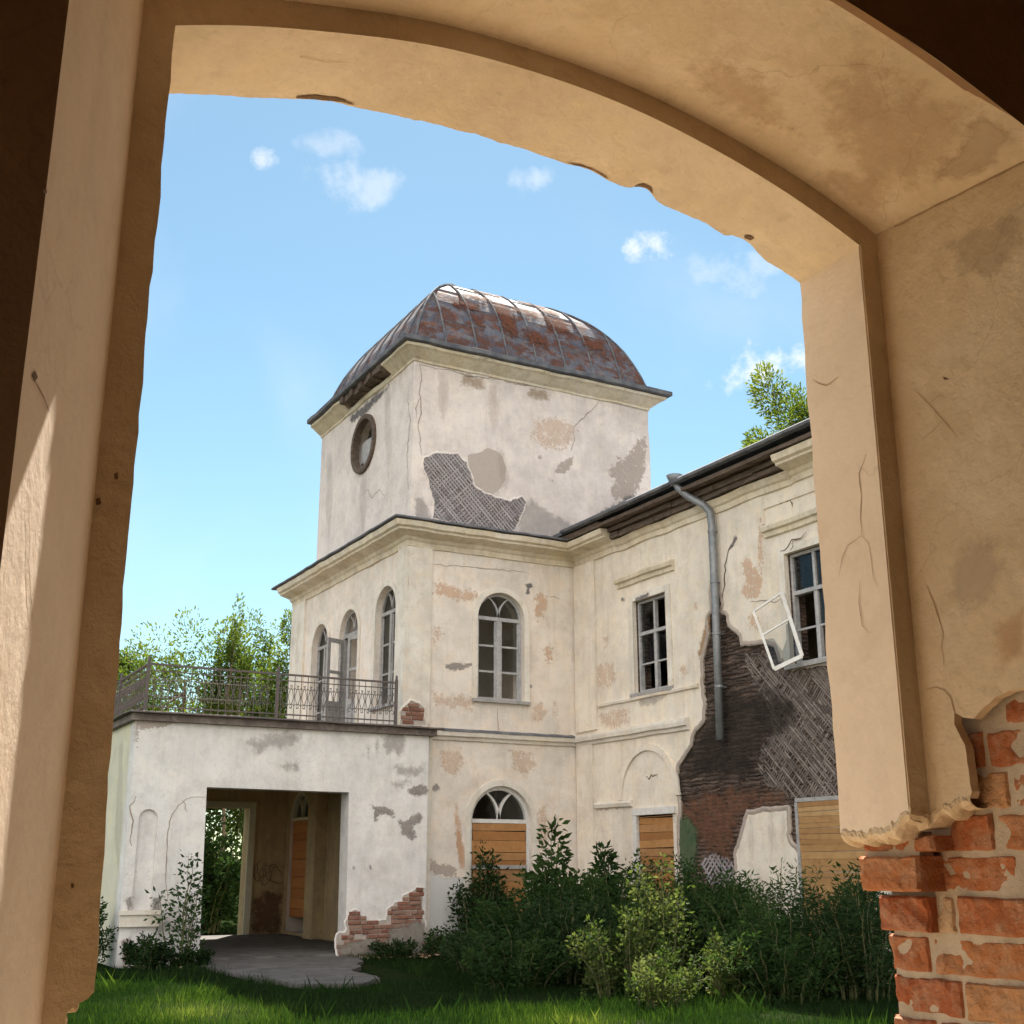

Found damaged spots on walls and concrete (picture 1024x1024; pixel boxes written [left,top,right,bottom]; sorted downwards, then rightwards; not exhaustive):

rust [450,289,608,359]
crack [406,364,529,488]
spalling [421,448,528,531]
peeling [610,436,647,498]
crack [722,539,734,598]
crack [839,456,878,628]
spalling [397,698,428,727]
spalling [676,583,839,889]
spalling [373,806,422,840]
spalling [841,691,1024,1024]
spalling [334,886,427,957]